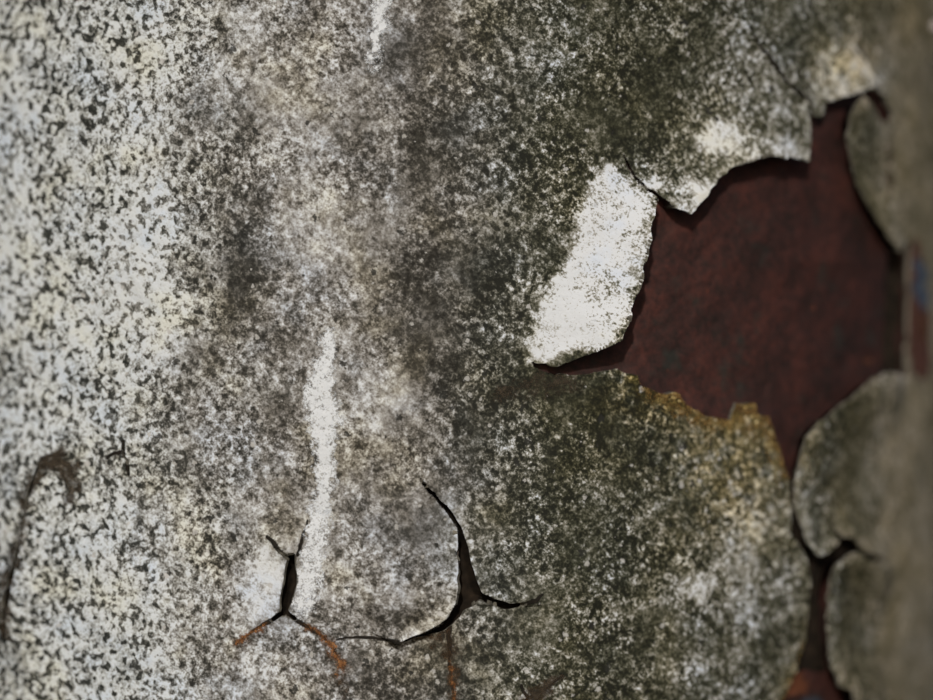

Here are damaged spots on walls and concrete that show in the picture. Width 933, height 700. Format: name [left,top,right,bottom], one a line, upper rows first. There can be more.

damp [365,0,392,71]
damp [291,327,344,620]
crack [237,483,544,700]
peeling [528,33,908,700]